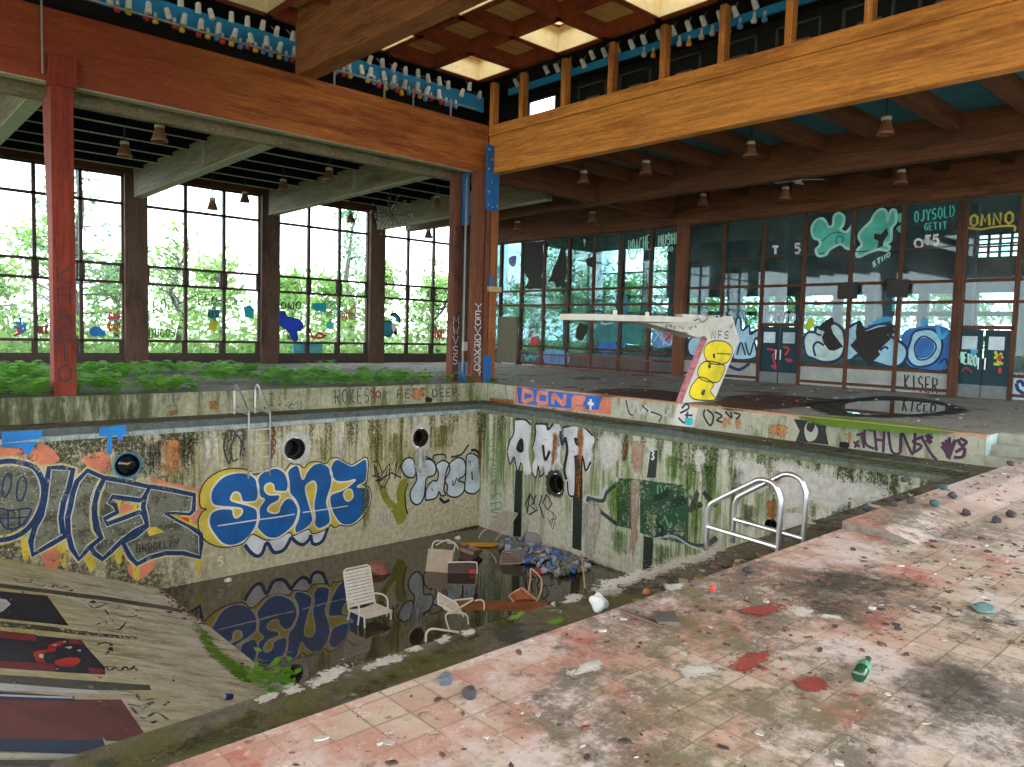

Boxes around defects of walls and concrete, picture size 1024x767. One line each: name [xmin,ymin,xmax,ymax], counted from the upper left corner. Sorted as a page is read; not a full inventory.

leakage [714,394,970,418]
leakage [147,441,161,468]
leakage [315,428,344,462]
leakage [362,482,370,526]
leakage [608,441,647,555]
leakage [666,456,712,538]
leakage [728,469,753,526]
peeling [735,456,912,530]
leakage [652,544,671,567]